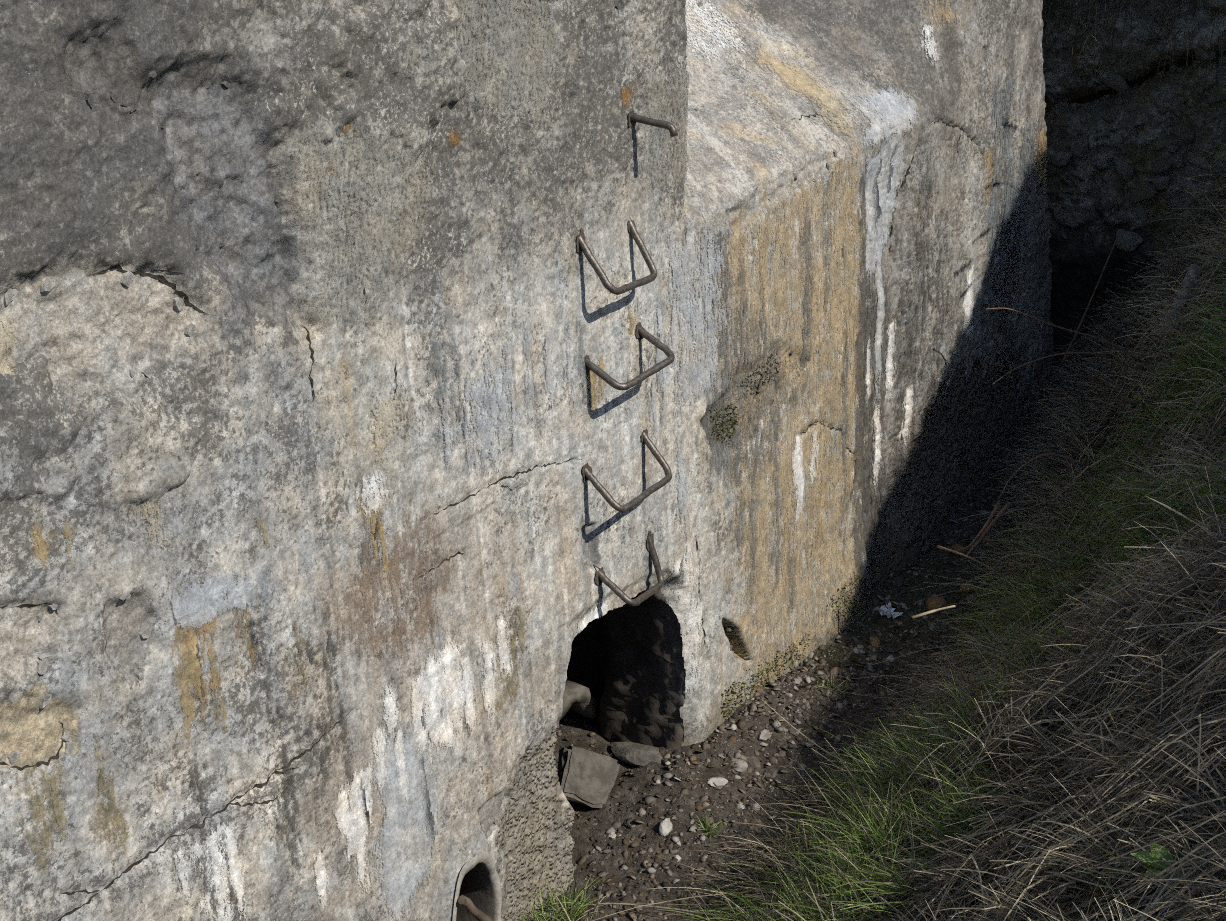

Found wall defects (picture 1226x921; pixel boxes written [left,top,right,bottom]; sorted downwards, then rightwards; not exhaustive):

crack [91,264,210,315]
water stain [685,0,1034,606]
crack [800,421,856,488]
crack [421,458,579,521]
crack [417,551,464,579]
crack [0,603,65,622]
spalling [0,596,81,775]
crack [0,721,64,771]
crack [58,709,353,921]
spalling [478,715,575,921]